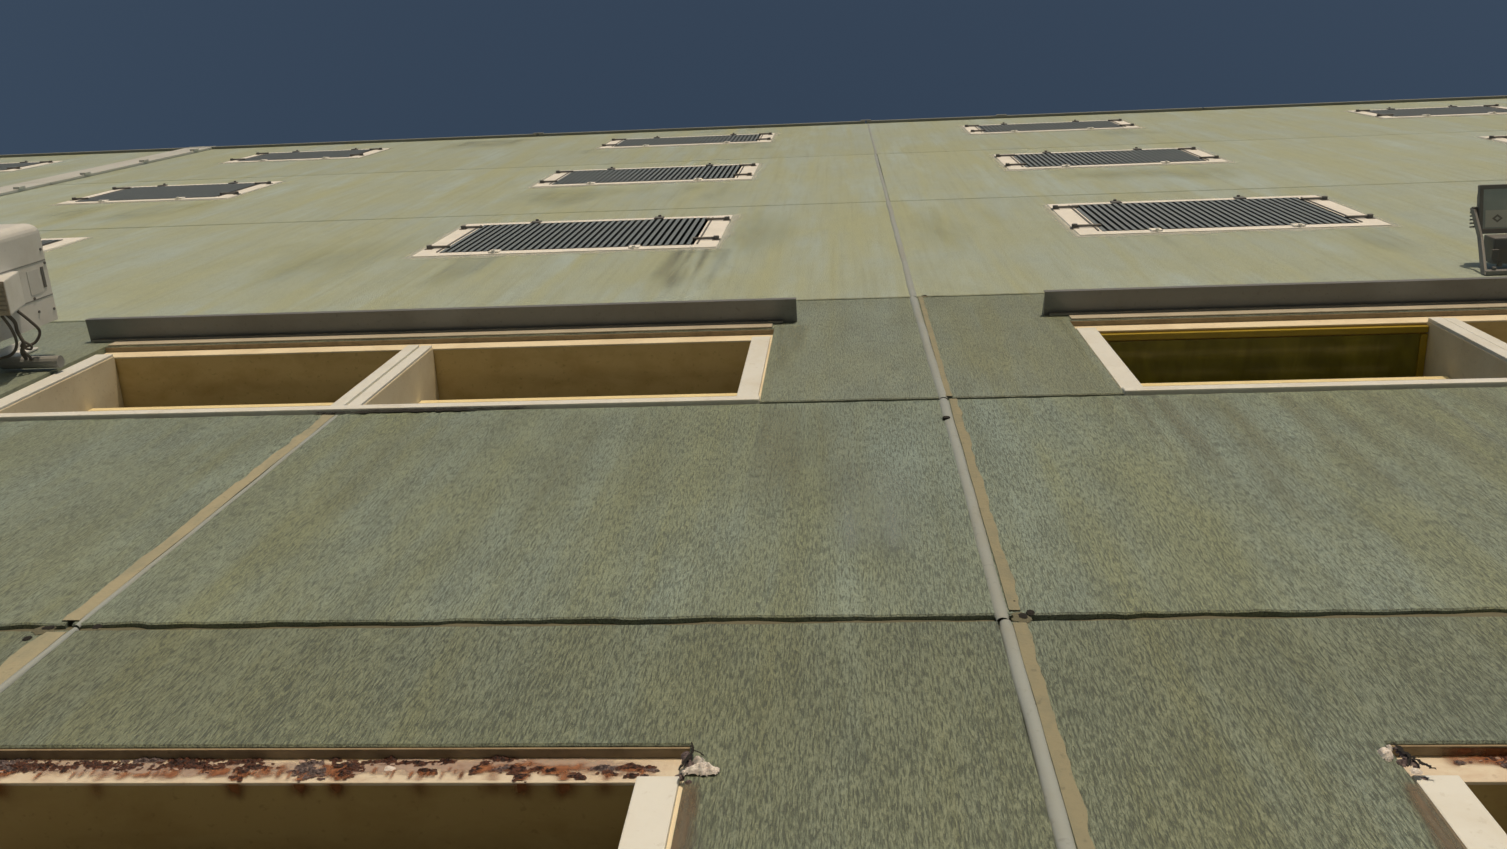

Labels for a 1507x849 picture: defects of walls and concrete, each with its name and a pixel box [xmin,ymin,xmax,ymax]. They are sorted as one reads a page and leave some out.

rust [1452,748,1507,756]
rust [226,773,245,796]
rust [291,773,308,795]
rust [328,773,343,795]
rust [510,772,529,795]
rust [555,771,573,796]